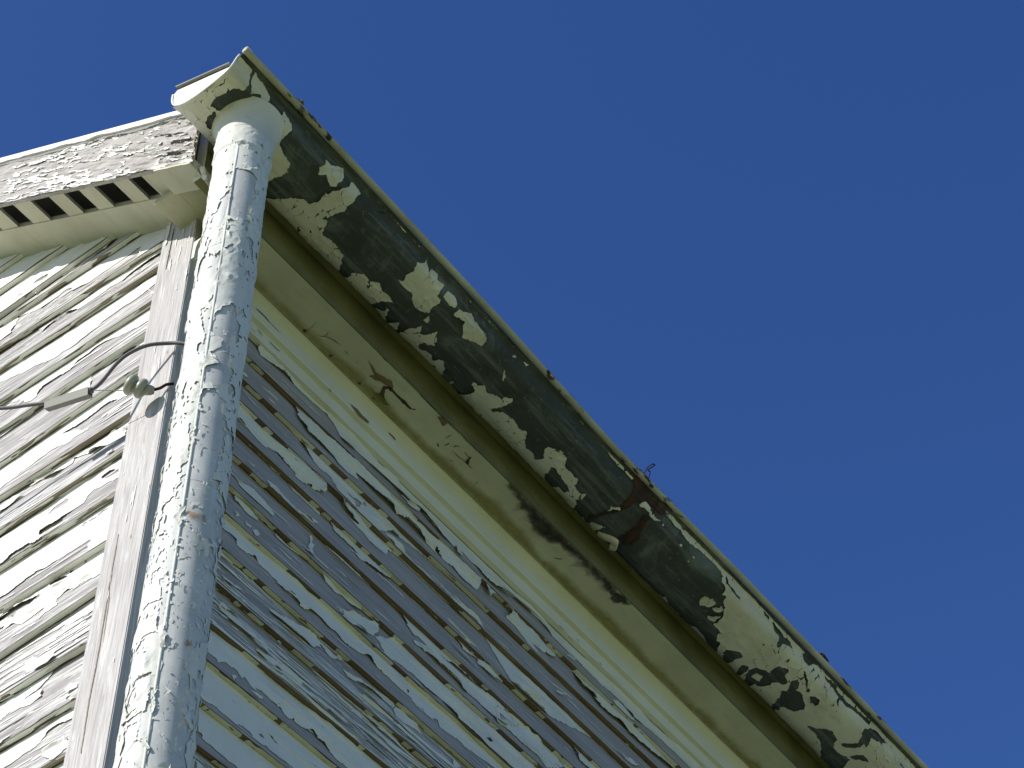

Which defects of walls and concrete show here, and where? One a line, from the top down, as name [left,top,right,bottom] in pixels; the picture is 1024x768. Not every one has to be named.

peeling [0,117,193,202]
peeling [0,232,160,368]
peeling [0,285,155,565]
peeling [123,60,887,768]
damp [509,484,629,605]
corrosion [588,457,682,545]
peeling [0,539,100,744]
peeling [4,719,72,768]